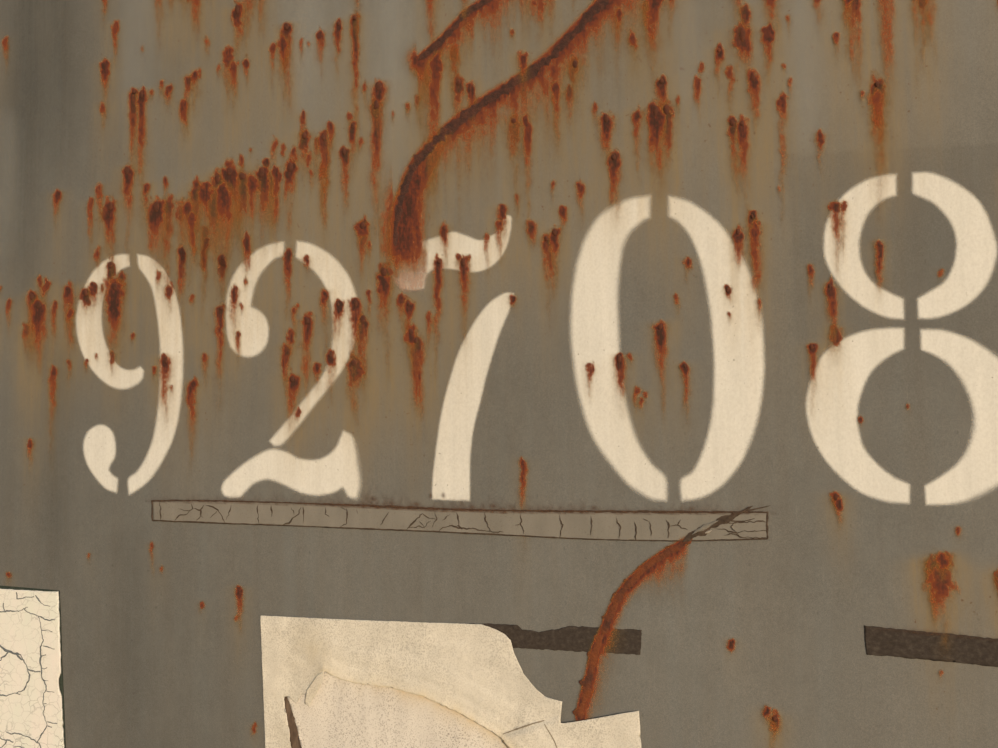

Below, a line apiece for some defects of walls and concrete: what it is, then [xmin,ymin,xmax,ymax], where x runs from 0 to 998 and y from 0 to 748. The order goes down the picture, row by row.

corrosion [693,0,792,174]
corrosion [861,0,895,156]
corrosion [22,0,680,418]
corrosion [732,210,762,312]
corrosion [827,201,848,240]
corrosion [824,278,843,347]
crack [159,503,231,523]
crack [257,506,358,526]
crack [381,512,524,533]
crack [0,592,57,748]
corrosion [573,537,692,721]
corrosion [924,551,958,615]